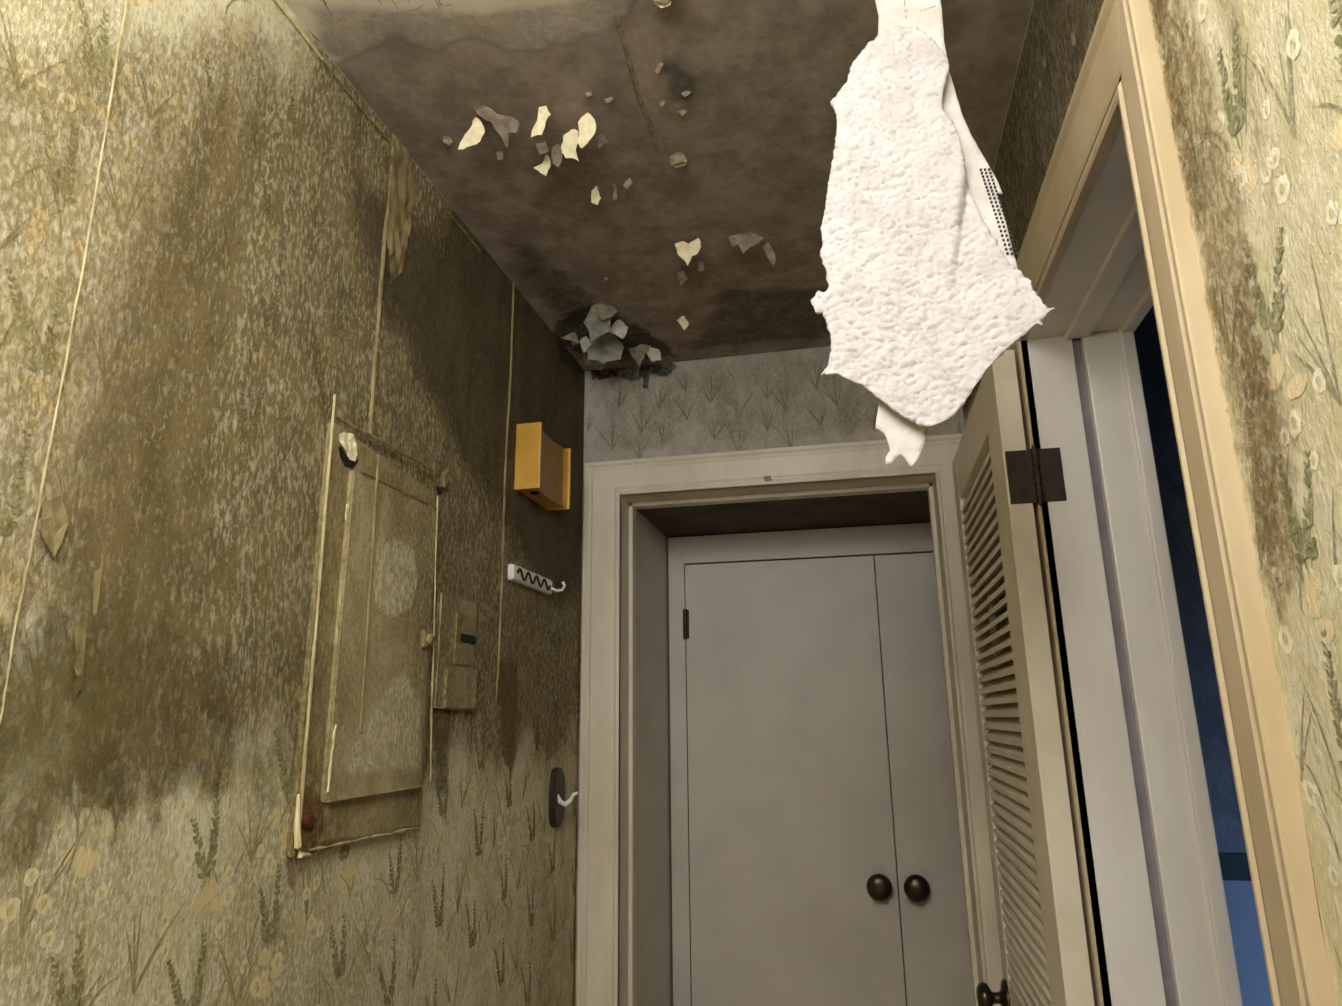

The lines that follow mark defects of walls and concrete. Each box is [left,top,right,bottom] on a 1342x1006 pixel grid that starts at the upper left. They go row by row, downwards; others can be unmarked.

peeling [653,0,671,8]
peeling [659,90,692,116]
peeling [442,105,609,176]
peeling [670,151,687,168]
water stain [941,0,1104,261]
peeling [591,178,633,205]
peeling [675,238,704,285]
peeling [729,232,776,266]
water stain [1149,0,1291,606]
peeling [560,303,661,377]
water stain [0,0,879,874]